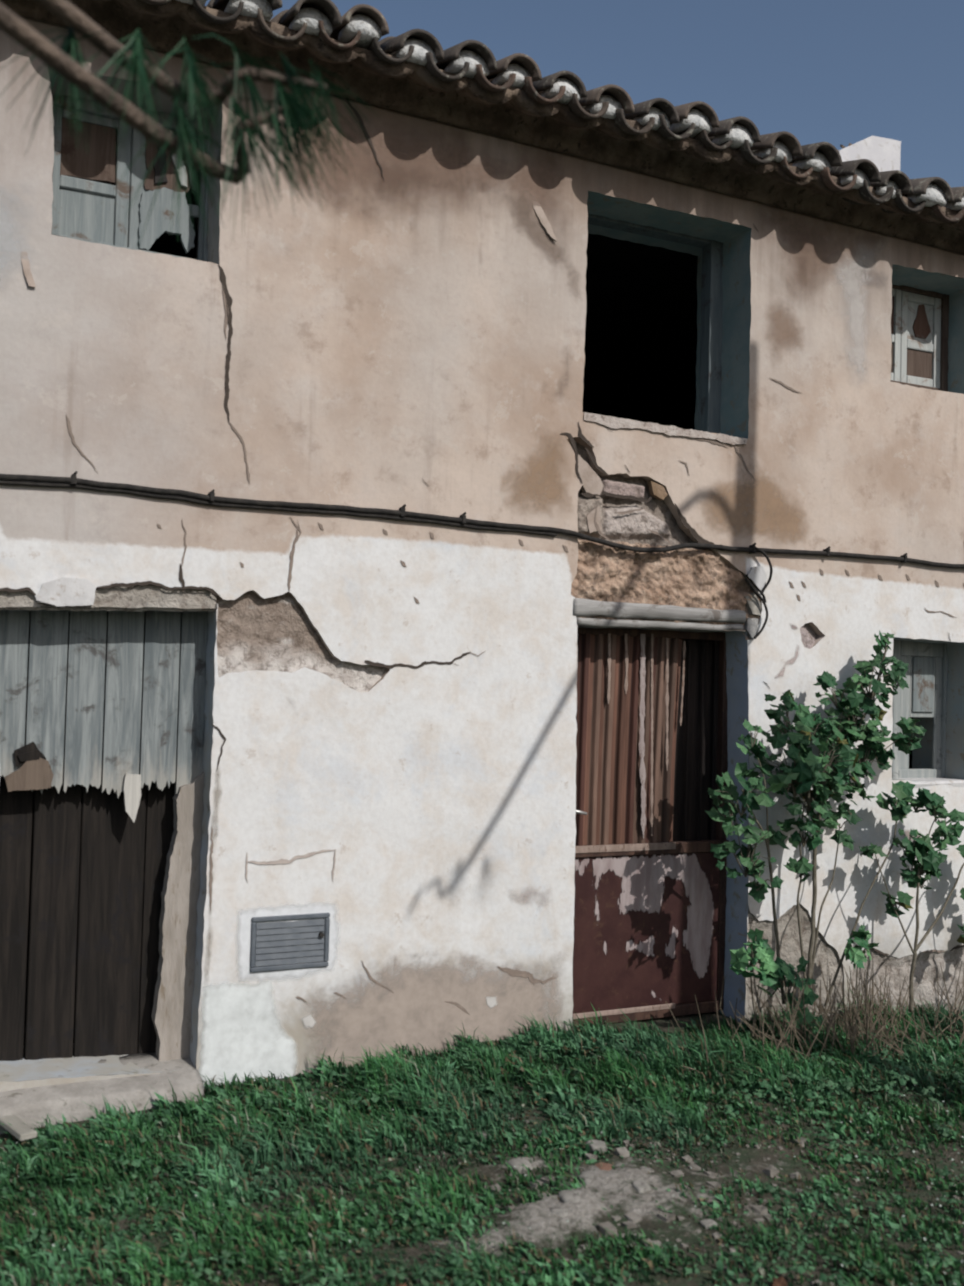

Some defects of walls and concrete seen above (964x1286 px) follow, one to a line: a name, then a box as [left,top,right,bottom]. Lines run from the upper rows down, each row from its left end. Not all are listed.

crack [346,98,385,181]
crack [218,263,250,484]
leakage [516,446,561,507]
spalling [563,439,767,640]
leakage [707,479,801,541]
spalling [0,577,387,692]
crack [365,651,485,669]
spalling [778,623,818,677]
crack [212,724,226,770]
crack [207,827,215,910]
crack [245,849,336,882]
spalling [746,904,964,1024]